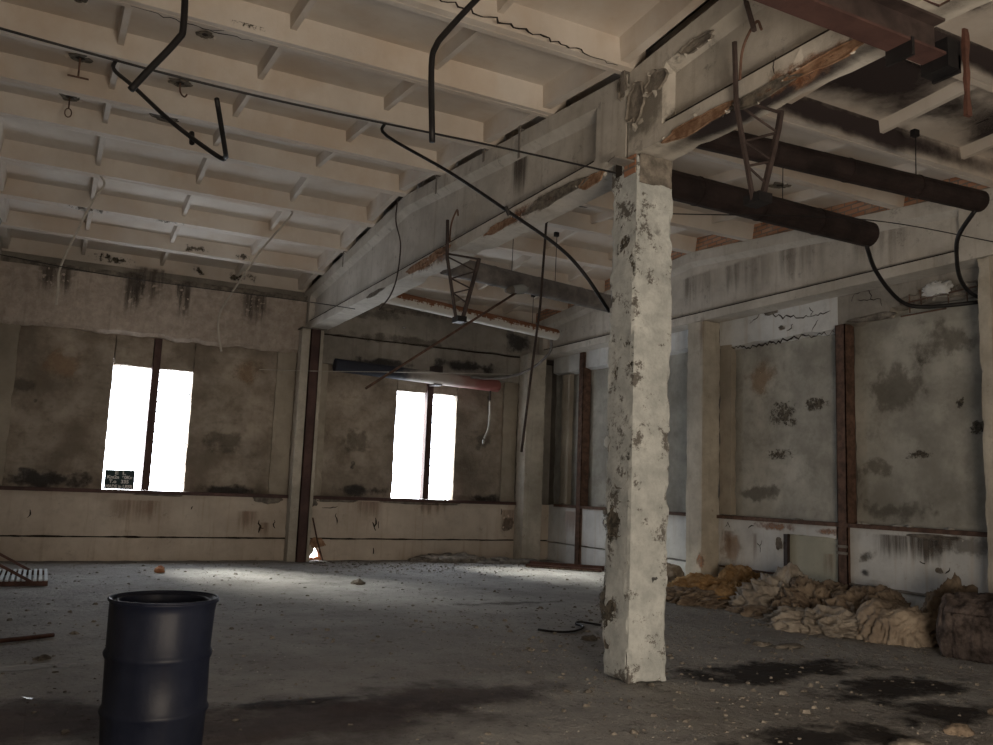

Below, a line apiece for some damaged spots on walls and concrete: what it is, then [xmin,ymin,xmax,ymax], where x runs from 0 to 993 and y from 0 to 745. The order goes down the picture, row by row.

flaking render [676,30,715,60]
flaking render [617,68,669,131]
spalling [661,39,864,144]
water stain [125,268,164,302]
spalling [846,279,978,323]
crack [732,307,834,349]
spalling [770,397,828,426]
water stain [13,468,89,487]
water stain [883,535,951,557]
flaking render [599,567,618,649]